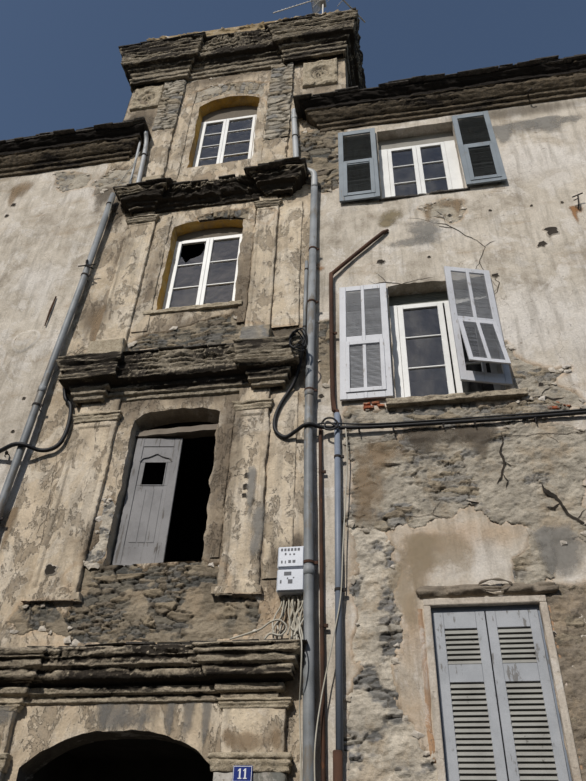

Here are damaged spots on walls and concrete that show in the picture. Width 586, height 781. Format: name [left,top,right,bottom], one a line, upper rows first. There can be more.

crack [418,211,500,294]
flaking render [127,314,245,351]
crack [492,431,586,488]
crack [542,484,586,526]
flaking render [9,498,261,646]
flaking render [340,342,586,781]